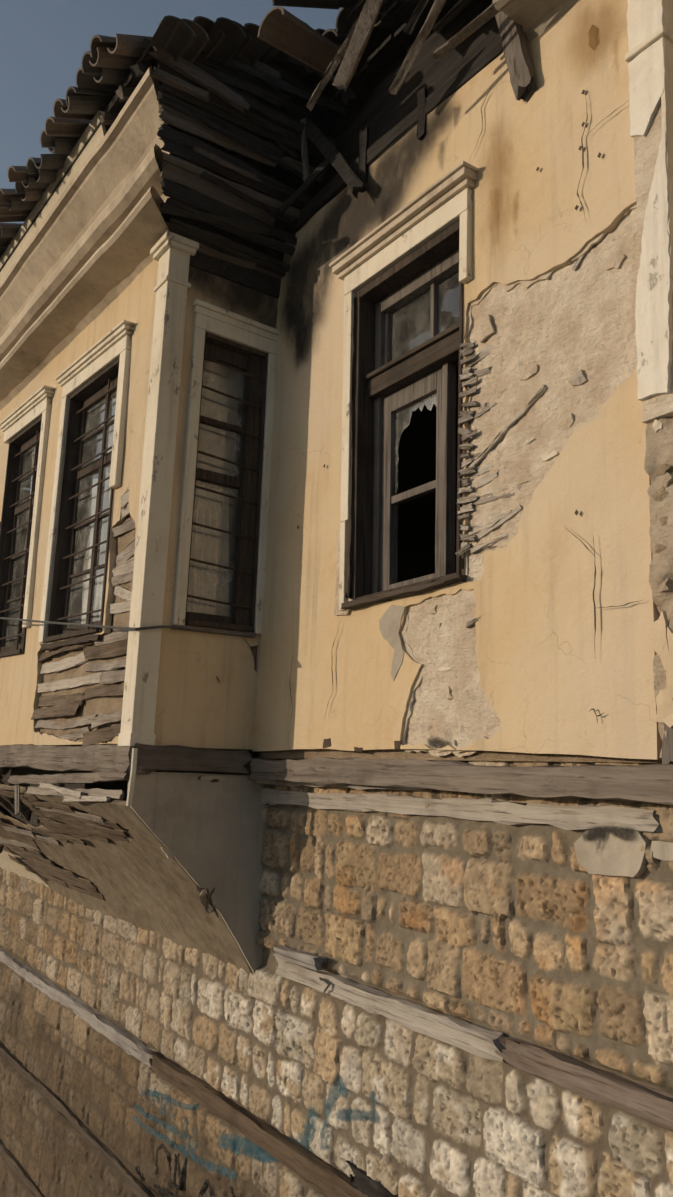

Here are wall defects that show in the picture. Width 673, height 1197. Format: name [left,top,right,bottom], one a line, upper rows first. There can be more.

crack [577,92,629,220]
damp [329,161,478,281]
spalling [394,204,638,758]
crack [564,527,642,646]
spalling [644,417,673,758]